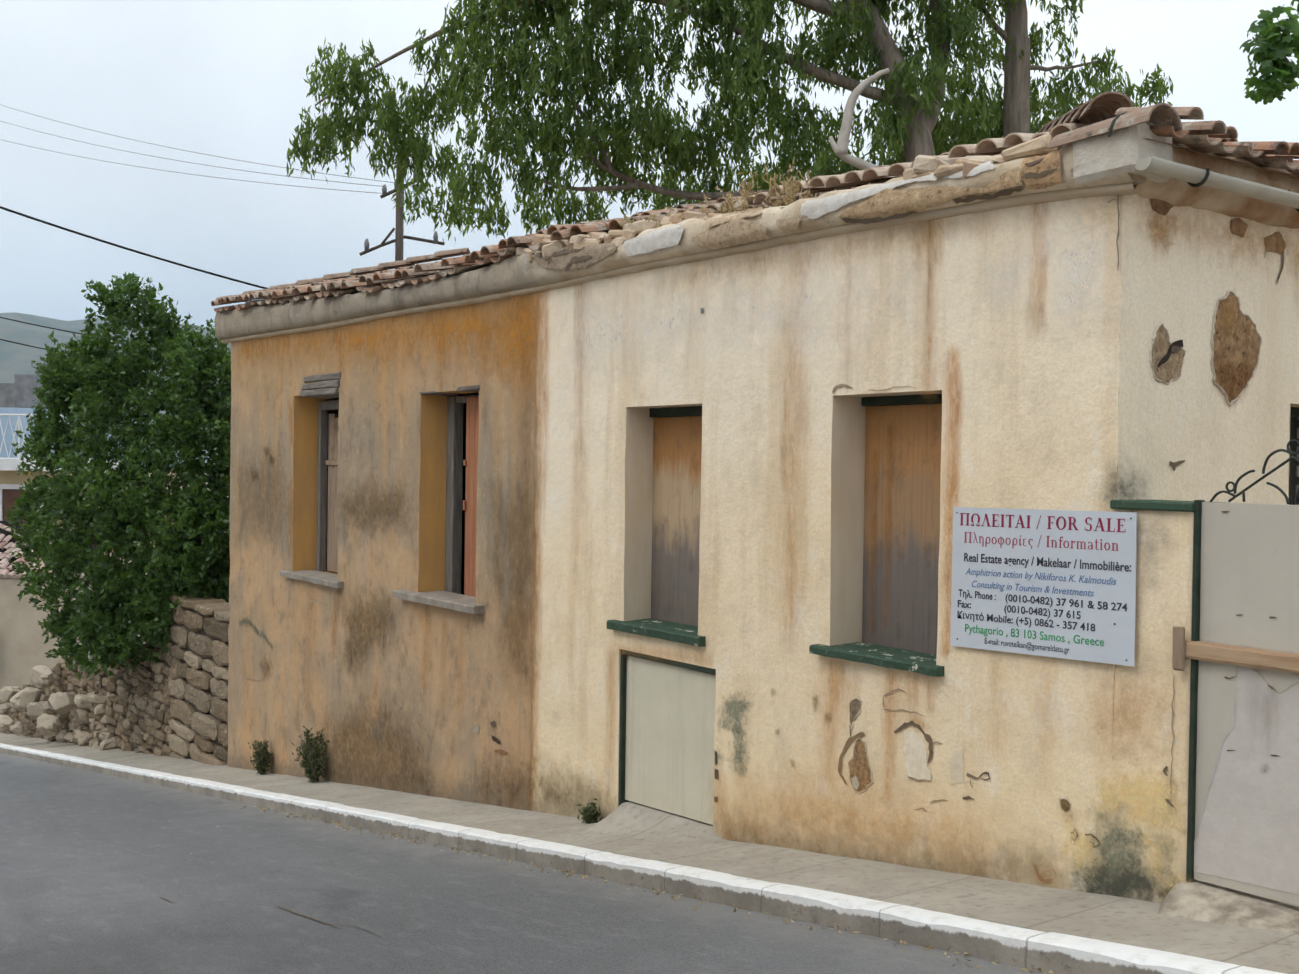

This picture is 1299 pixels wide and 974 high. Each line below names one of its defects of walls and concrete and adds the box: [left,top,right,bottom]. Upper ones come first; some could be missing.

spalling [1231,218,1248,237]
spalling [1264,231,1286,283]
spalling [1149,322,1186,385]
spalling [1210,290,1262,407]
spalling [838,696,874,794]
flaking render [894,721,943,782]